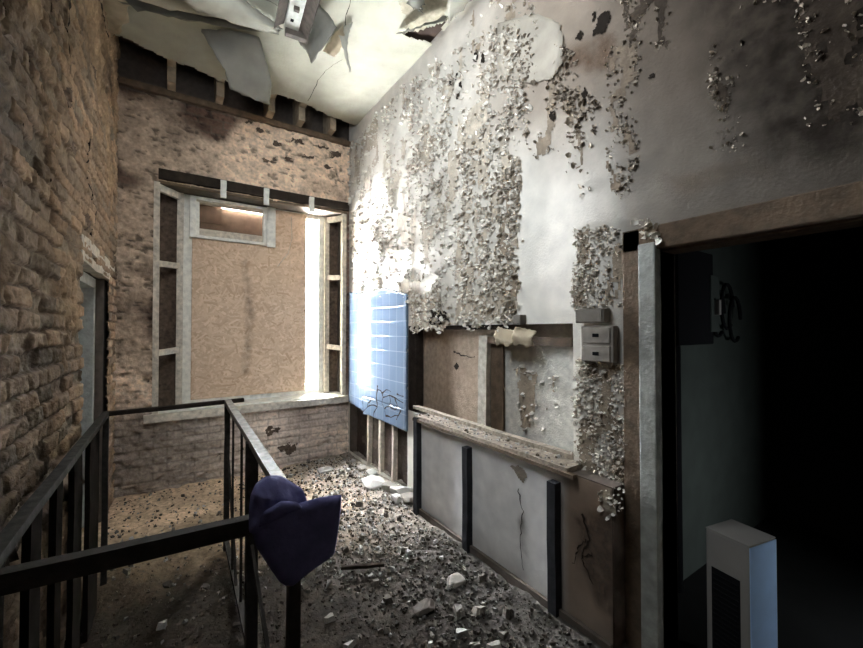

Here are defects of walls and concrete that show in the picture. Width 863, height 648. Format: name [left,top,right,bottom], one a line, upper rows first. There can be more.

peeling [705,44,744,152]
peeling [794,0,863,126]
peeling [262,0,670,334]
crack [363,385,404,420]
crack [573,513,593,584]